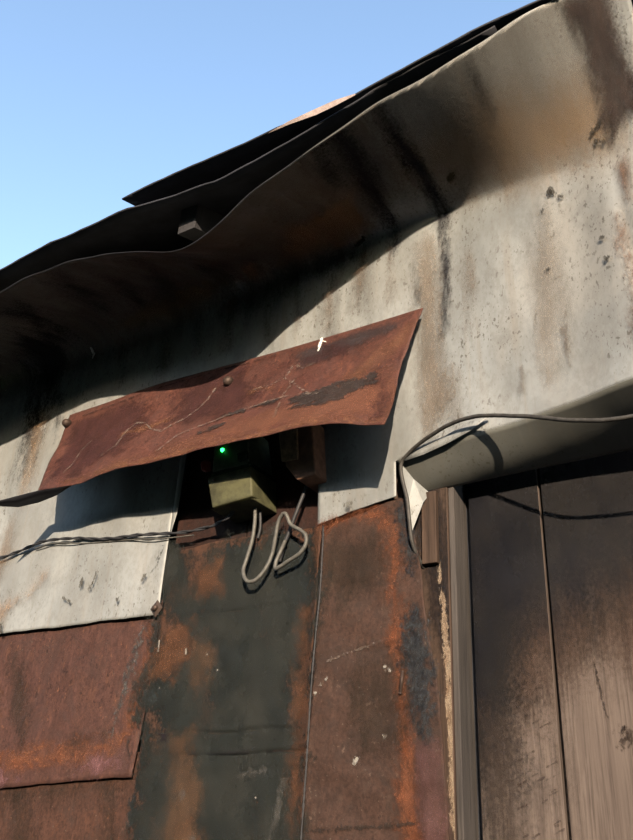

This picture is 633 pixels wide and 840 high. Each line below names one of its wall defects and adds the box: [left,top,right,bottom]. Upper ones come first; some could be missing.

leakage [439,0,633,171]
rust [0,600,164,840]
rust [386,614,424,840]
leakage [473,571,633,801]